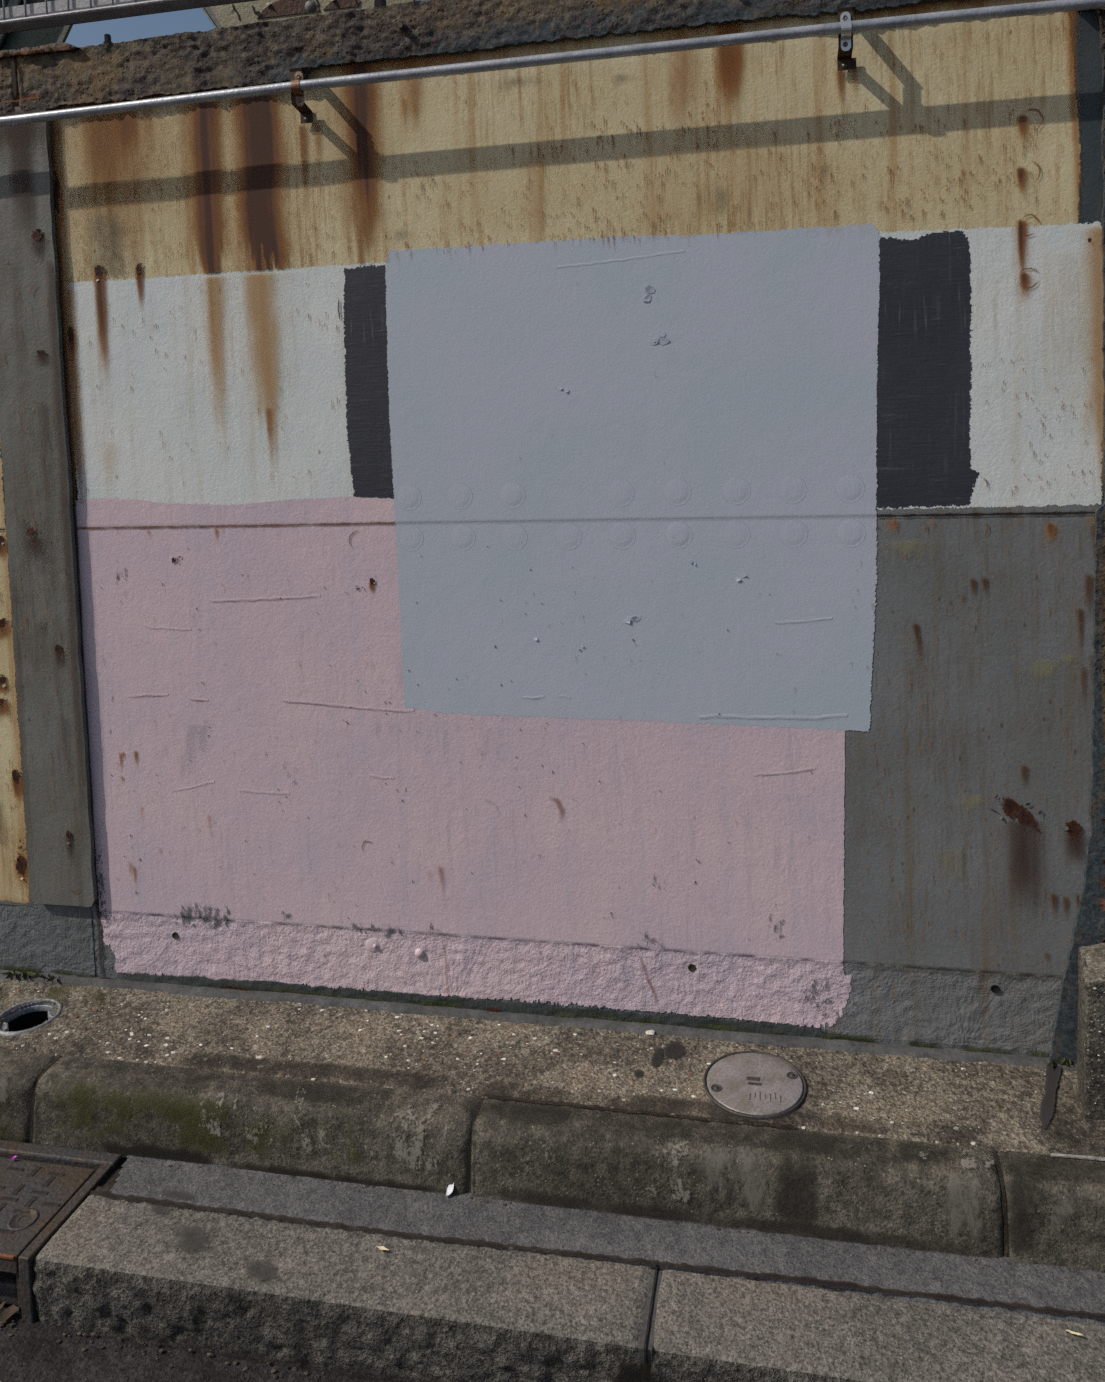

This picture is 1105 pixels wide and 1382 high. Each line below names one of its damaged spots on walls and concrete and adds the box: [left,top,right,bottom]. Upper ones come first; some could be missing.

corrosion [894,0,986,15]
corrosion [716,24,741,96]
corrosion [542,107,720,243]
corrosion [885,118,1036,219]
corrosion [83,53,466,437]
corrosion [0,110,142,980]
corrosion [989,795,1043,890]
corrosion [1062,820,1083,857]